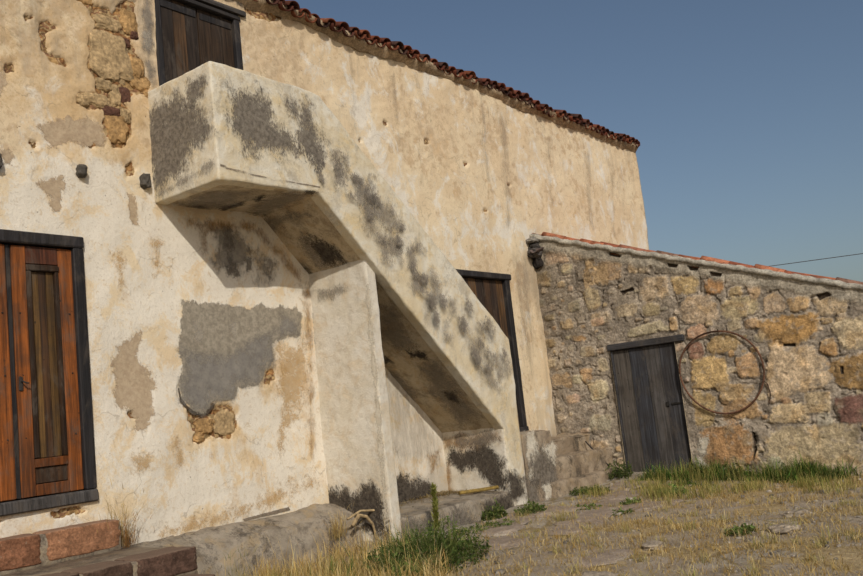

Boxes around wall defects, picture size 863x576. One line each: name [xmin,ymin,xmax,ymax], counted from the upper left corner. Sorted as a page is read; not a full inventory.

spalling [24,0,151,149]
mould [149,77,218,195]
water stain [182,82,512,387]
peeling [110,330,157,432]
spalling [187,404,237,444]
peeling [263,342,306,451]
mould [328,480,478,539]